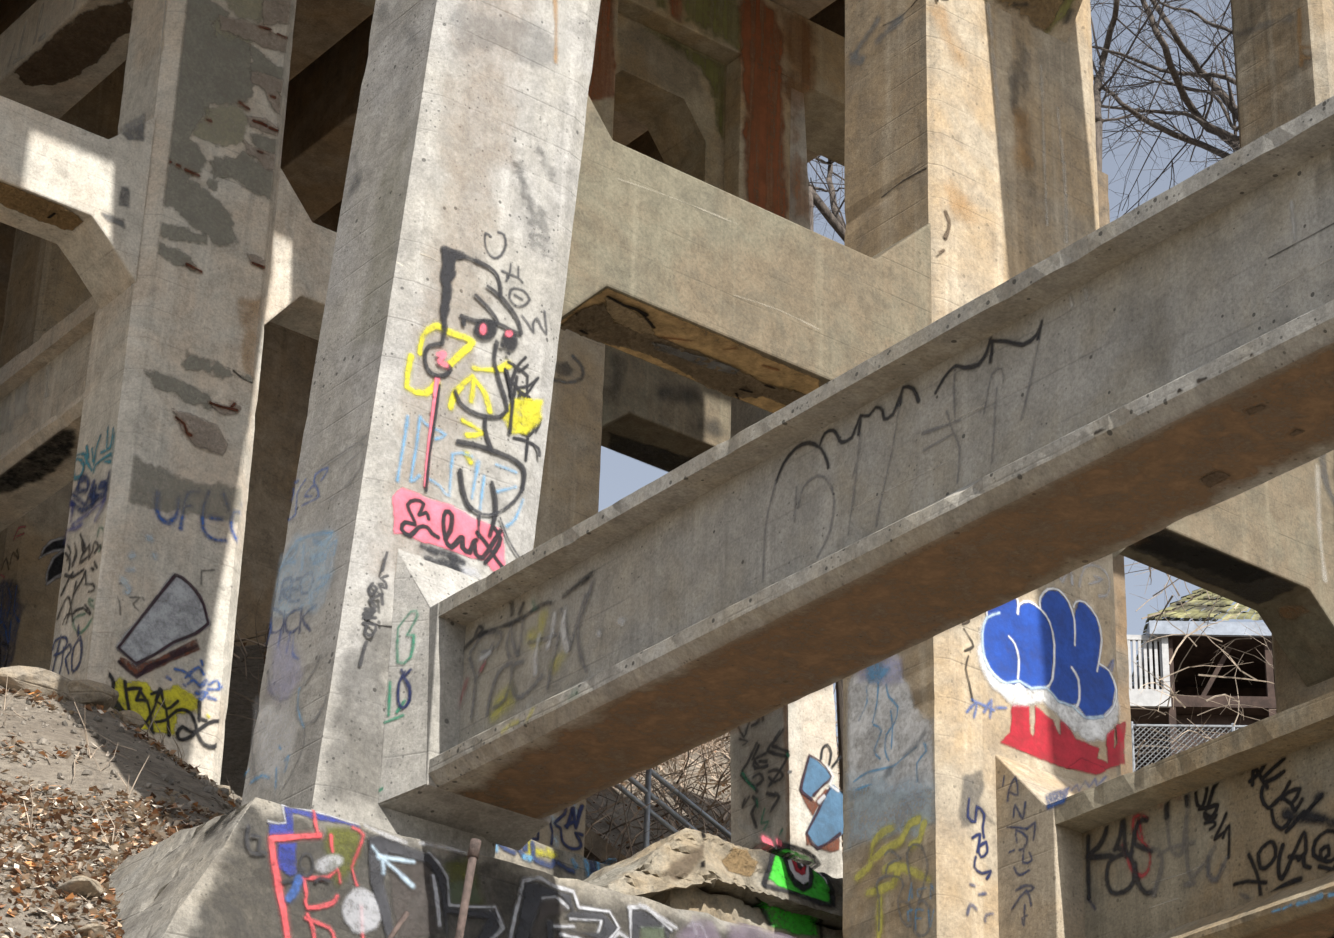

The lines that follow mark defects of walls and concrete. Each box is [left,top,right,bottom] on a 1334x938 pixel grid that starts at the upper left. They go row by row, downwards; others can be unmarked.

peeling [159,0,291,273]
rust [588,0,616,100]
rust [740,0,811,219]
spalling [998,0,1073,30]
spalling [146,354,253,455]
spalling [560,288,819,413]
peeling [131,457,241,520]
damp [460,348,1334,823]